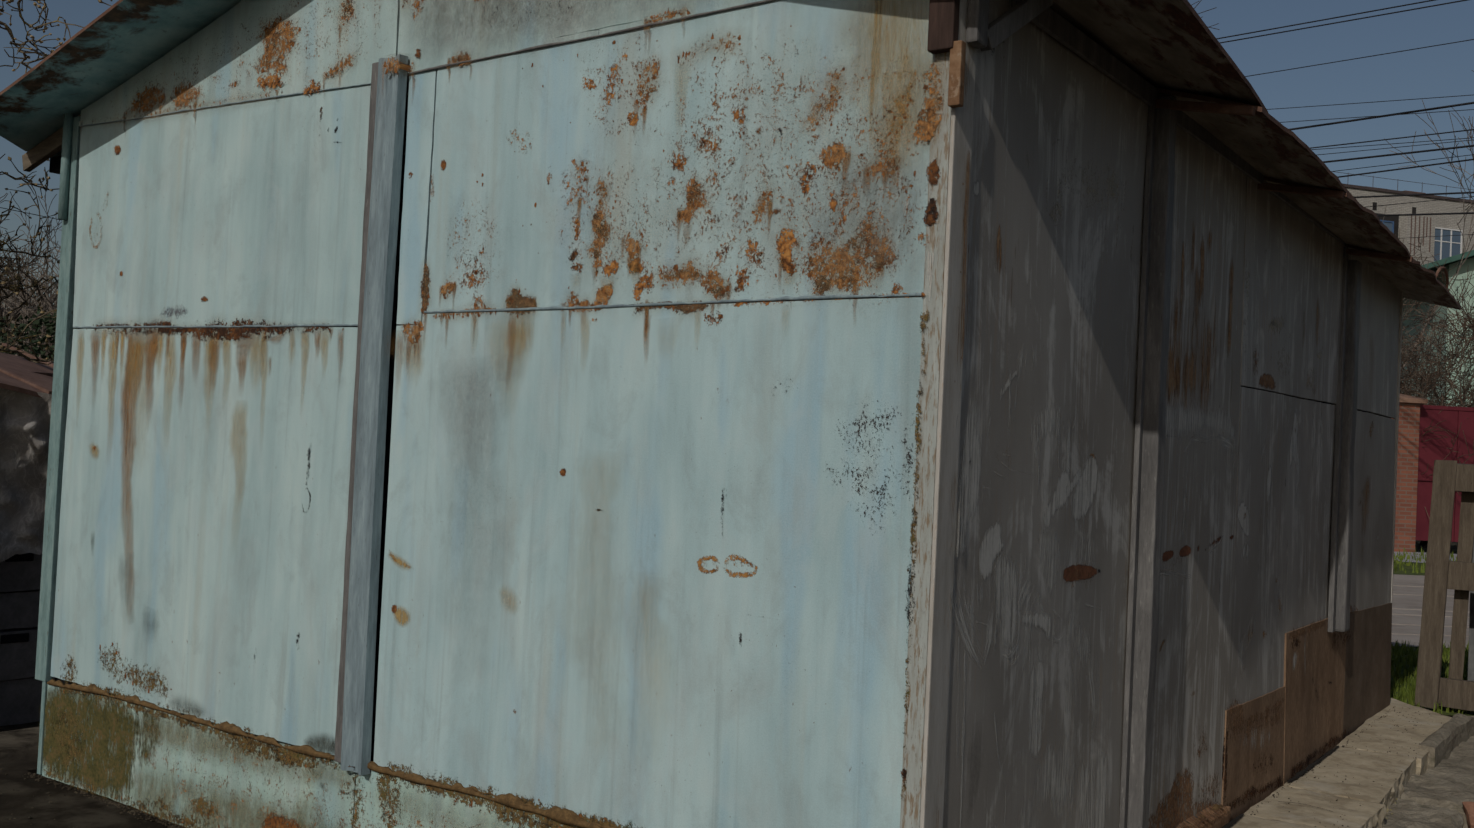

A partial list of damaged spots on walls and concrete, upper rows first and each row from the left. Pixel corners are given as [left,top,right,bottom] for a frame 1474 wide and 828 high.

rust [112,0,381,123]
rust [383,49,420,80]
rust [451,51,470,67]
rust [563,8,691,145]
rust [522,33,944,336]
rust [403,202,537,346]
rust [1166,225,1276,411]
rust [86,318,344,511]
rust [1063,564,1100,588]
rust [44,642,643,828]